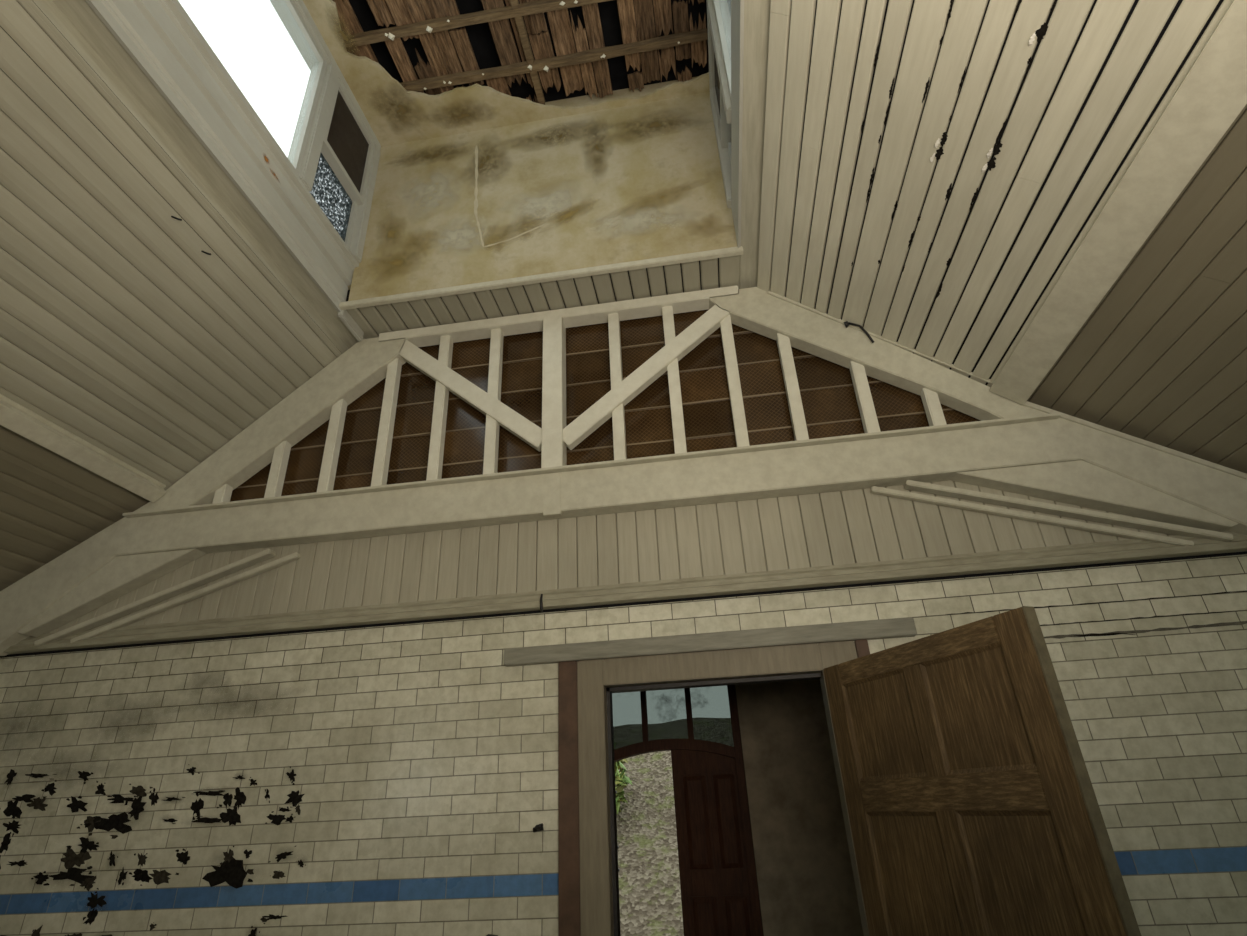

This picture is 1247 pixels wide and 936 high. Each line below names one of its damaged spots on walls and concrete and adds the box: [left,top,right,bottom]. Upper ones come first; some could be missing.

water stain [519,192,584,233]
spalling [0,766,306,936]